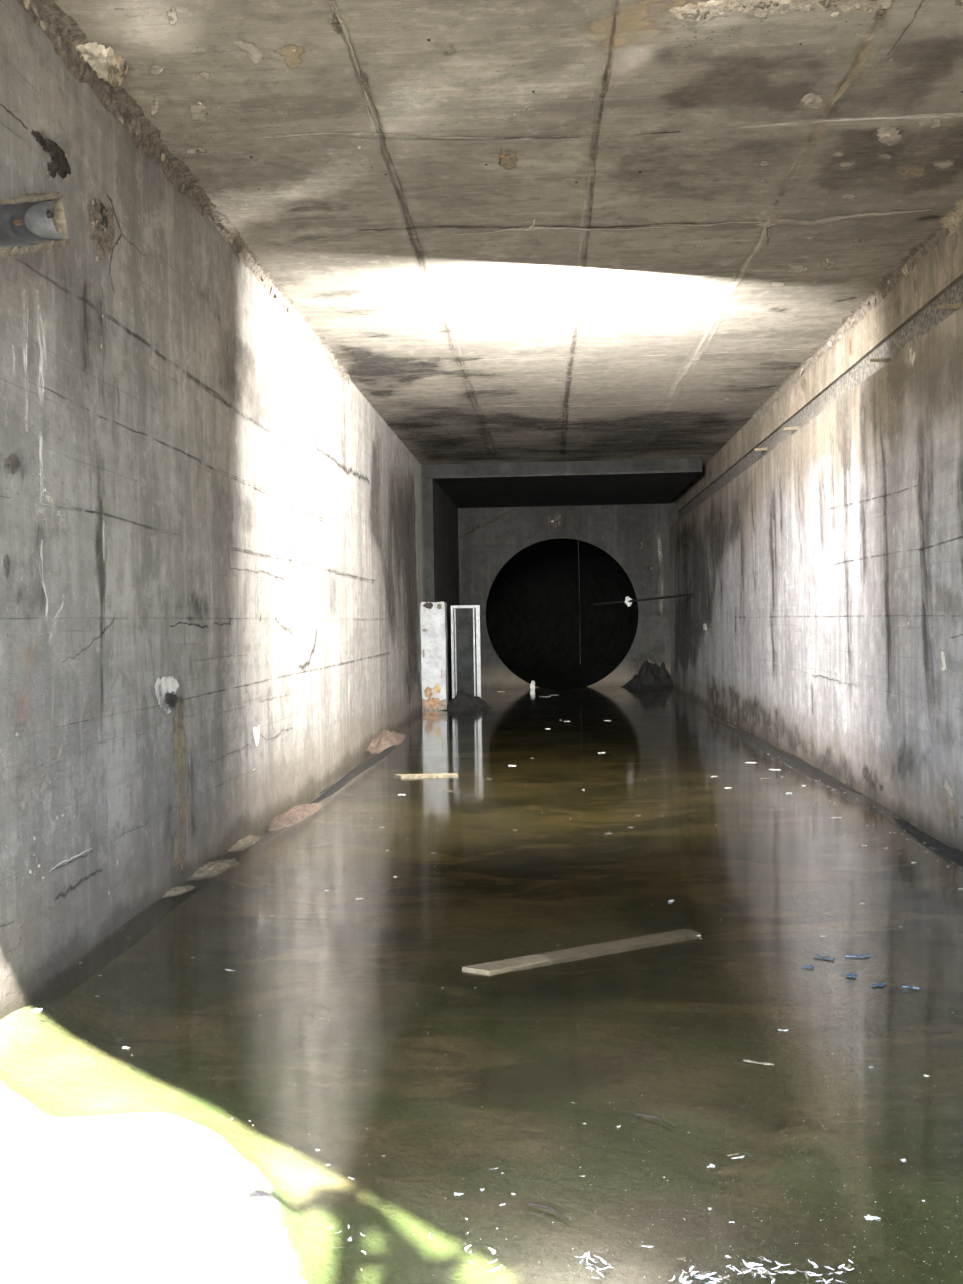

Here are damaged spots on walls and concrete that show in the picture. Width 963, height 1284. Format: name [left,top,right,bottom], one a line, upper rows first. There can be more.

spalling [0,104,71,180]
spalling [16,0,351,386]
crack [604,14,616,82]
crack [348,50,940,371]
spalling [589,0,893,47]
crack [805,0,924,146]
water stain [342,336,494,398]
water stain [389,408,743,462]
spalling [752,197,963,419]
water stain [770,368,906,692]
water stain [907,425,947,703]
corrosion [168,699,194,871]